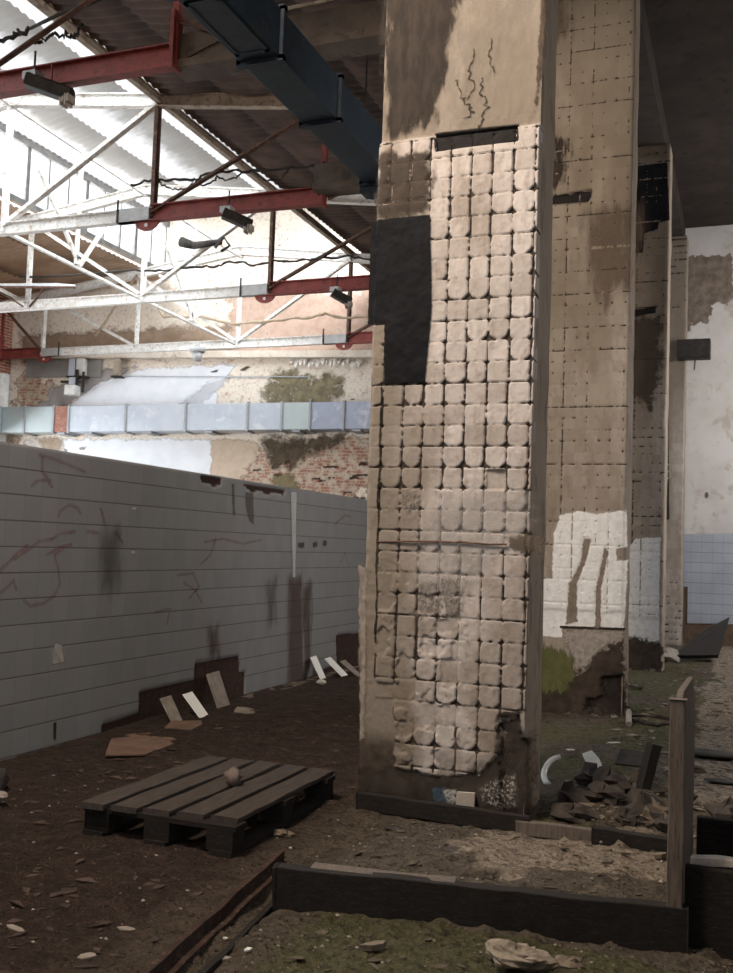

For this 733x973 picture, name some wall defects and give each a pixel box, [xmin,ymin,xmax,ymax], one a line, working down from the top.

water stain [374,0,460,219]
crack [455,38,495,132]
water stain [260,369,345,403]
flaking render [200,434,369,497]
water stain [541,635,665,717]